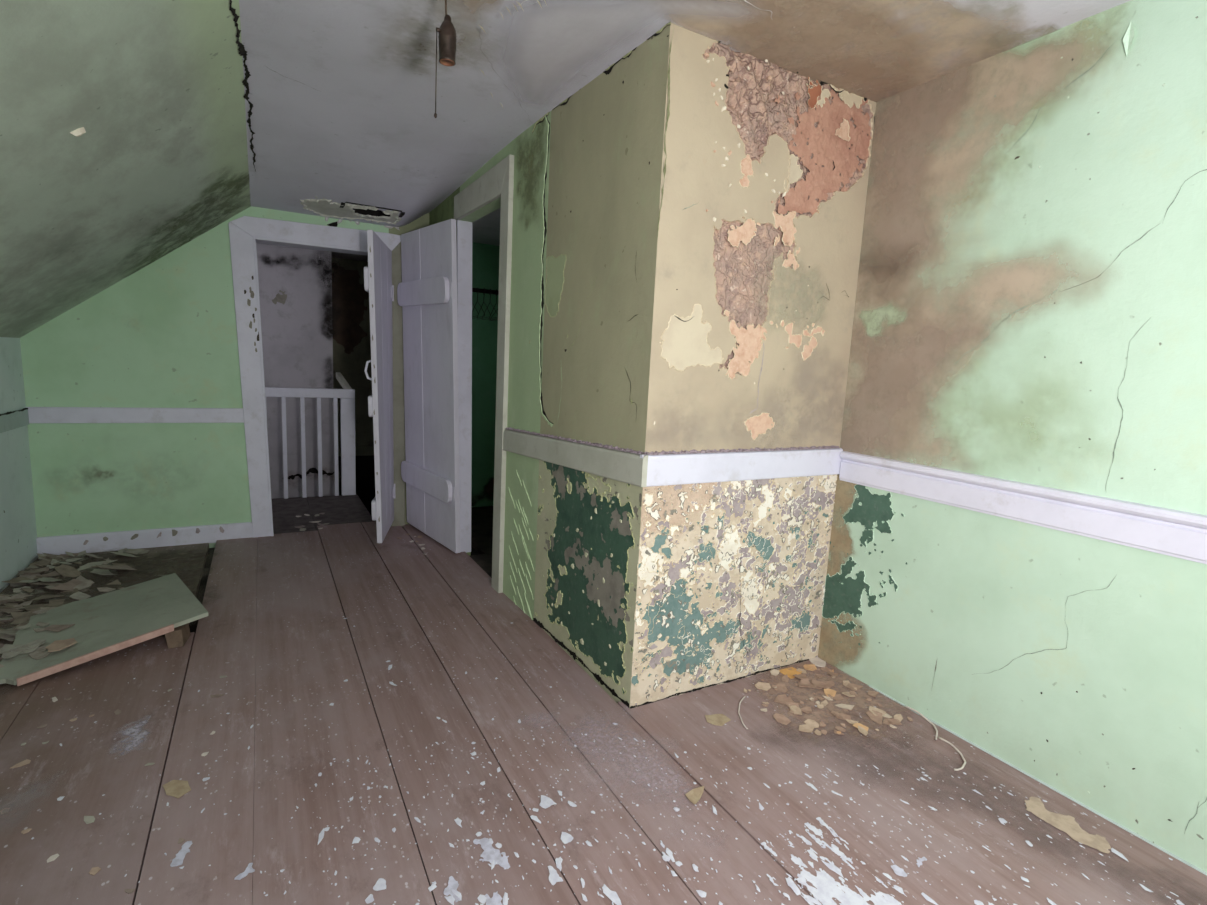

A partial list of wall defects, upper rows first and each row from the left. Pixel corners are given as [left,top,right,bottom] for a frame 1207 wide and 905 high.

crack [229,0,321,168]
leakage [263,257,341,338]
spalling [660,41,876,384]
leakage [662,0,1103,463]
crack [1060,169,1207,292]
crack [1105,326,1143,490]
peeling [535,461,905,705]
crack [971,576,1116,675]